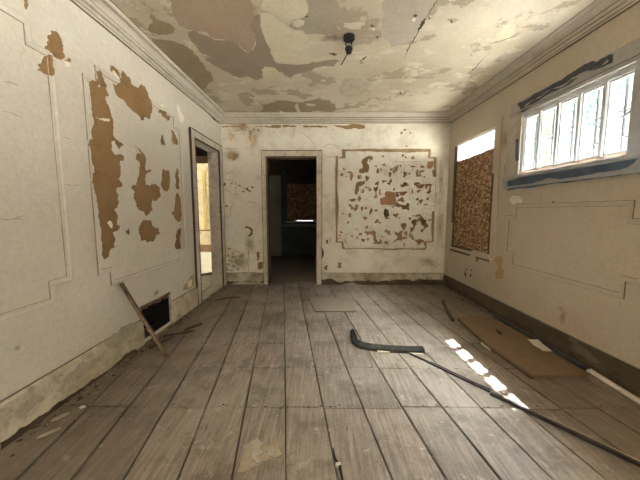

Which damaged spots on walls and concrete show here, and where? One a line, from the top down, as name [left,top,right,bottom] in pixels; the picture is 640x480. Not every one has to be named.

peeling [36,29,72,76]
crack [405,1,437,56]
peeling [86,64,170,261]
peeling [131,144,182,250]
peeling [221,123,365,142]
peeling [335,145,437,250]